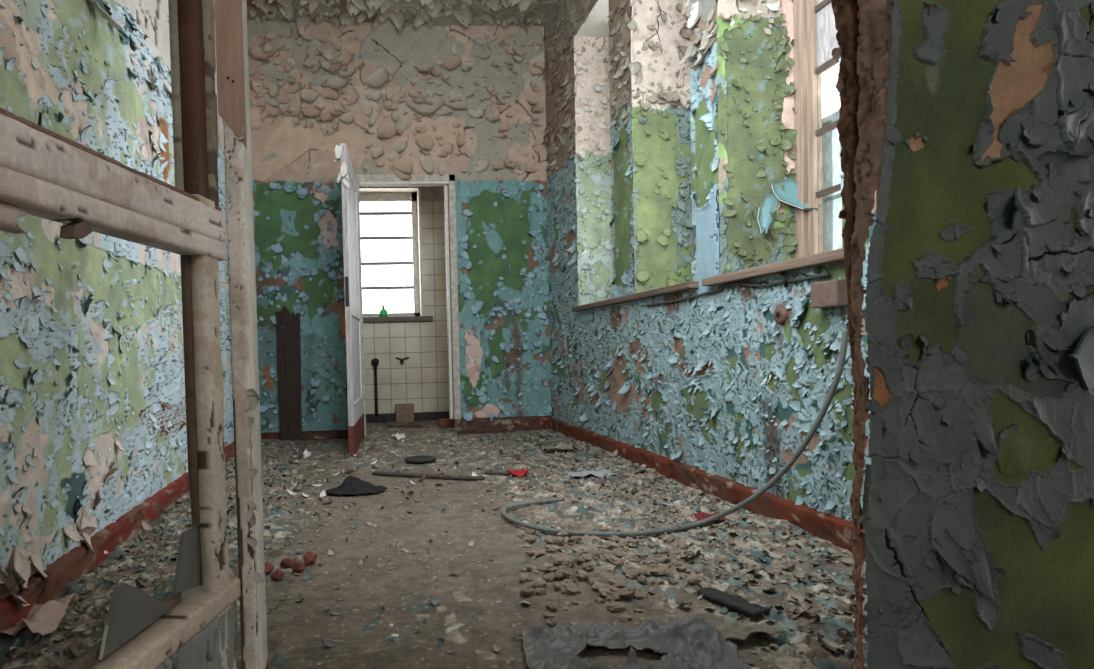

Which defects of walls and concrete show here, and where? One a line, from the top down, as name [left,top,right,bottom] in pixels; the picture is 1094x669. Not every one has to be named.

peeling [0,0,172,182]
peeling [1021,117,1094,177]
peeling [0,215,188,607]
peeling [214,0,1075,669]
crack [904,363,925,445]
peeling [1043,325,1094,390]
crack [884,529,943,648]